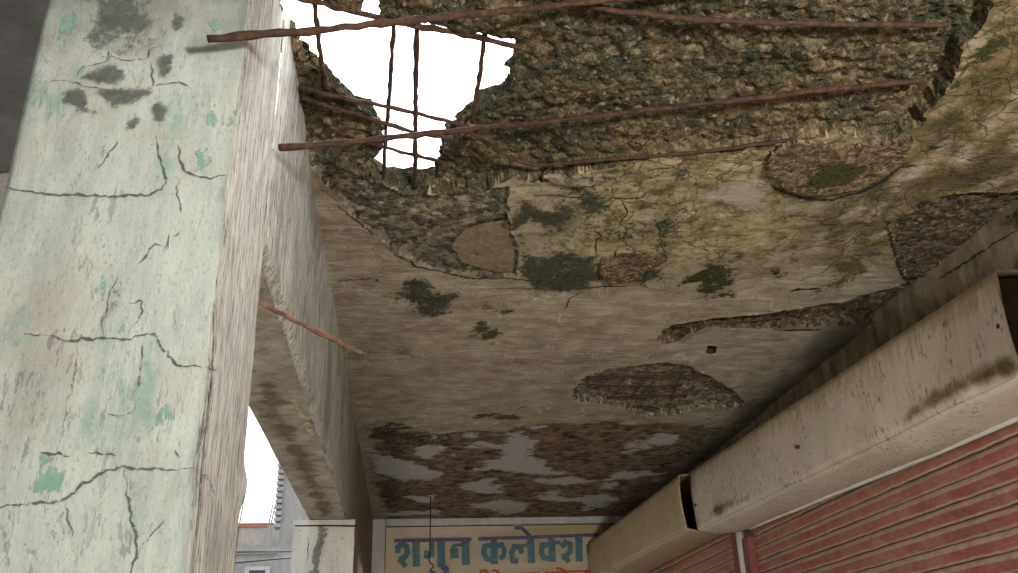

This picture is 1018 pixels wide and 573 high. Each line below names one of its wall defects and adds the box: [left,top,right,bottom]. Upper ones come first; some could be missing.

leakage [63,88,96,112]
crack [5,137,220,263]
leakage [85,0,152,54]
leakage [83,65,167,121]
leakage [158,54,173,76]
peeling [194,146,212,172]
spalling [202,0,996,279]
spalling [657,191,1018,344]
crack [0,278,217,573]
peeling [362,362,744,519]